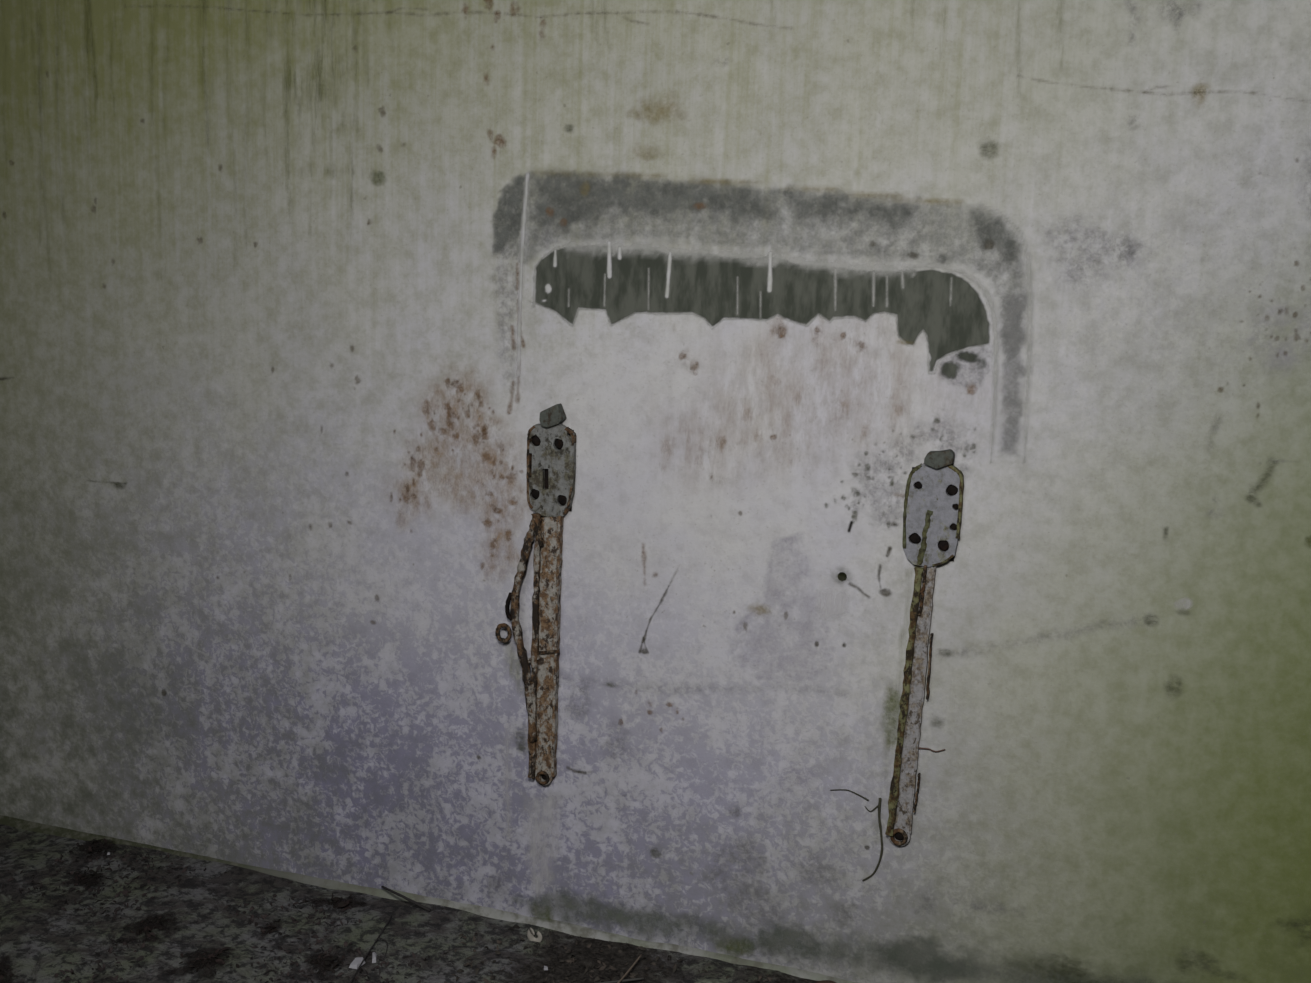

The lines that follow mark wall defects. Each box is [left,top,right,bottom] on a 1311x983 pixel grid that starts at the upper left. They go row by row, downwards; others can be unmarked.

peeling [495,173,1023,450]
rust [391,379,535,548]
rust [902,463,922,549]
rust [947,464,964,539]
rust [918,555,954,615]
rust [913,773,921,813]
water stain [531,797,1087,983]